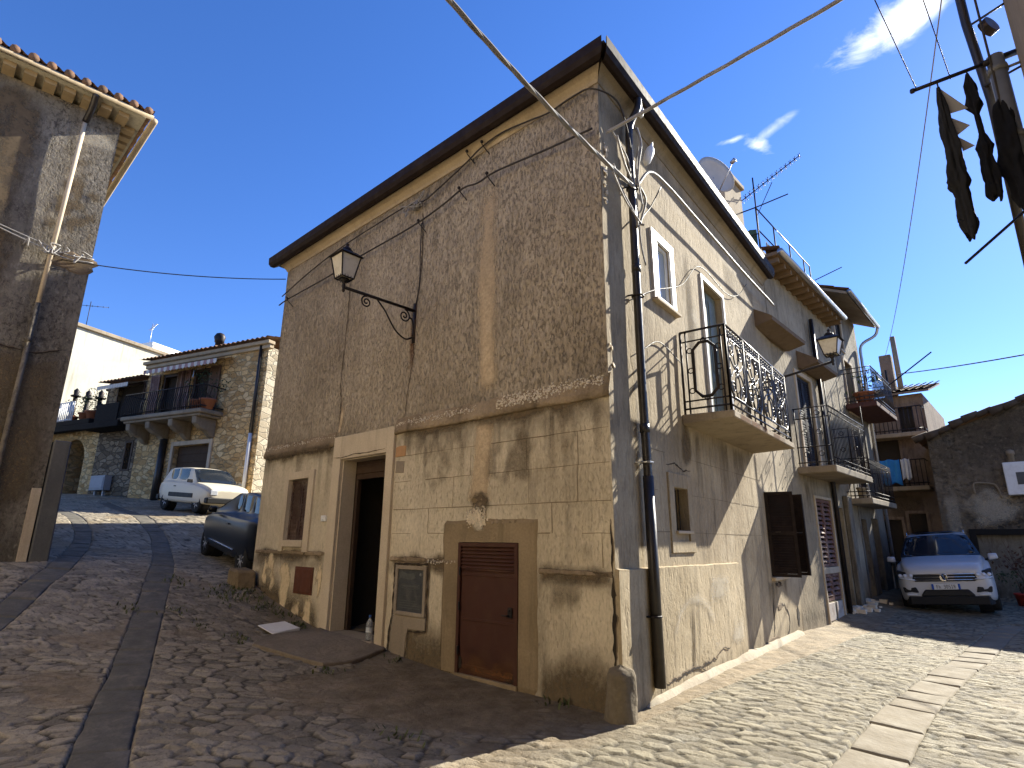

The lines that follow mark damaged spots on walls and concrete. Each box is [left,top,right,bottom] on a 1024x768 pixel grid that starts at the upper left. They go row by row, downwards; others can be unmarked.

leakage [479,203,495,385]
leakage [268,447,332,462]
leakage [404,399,594,499]
spalling [466,492,517,530]